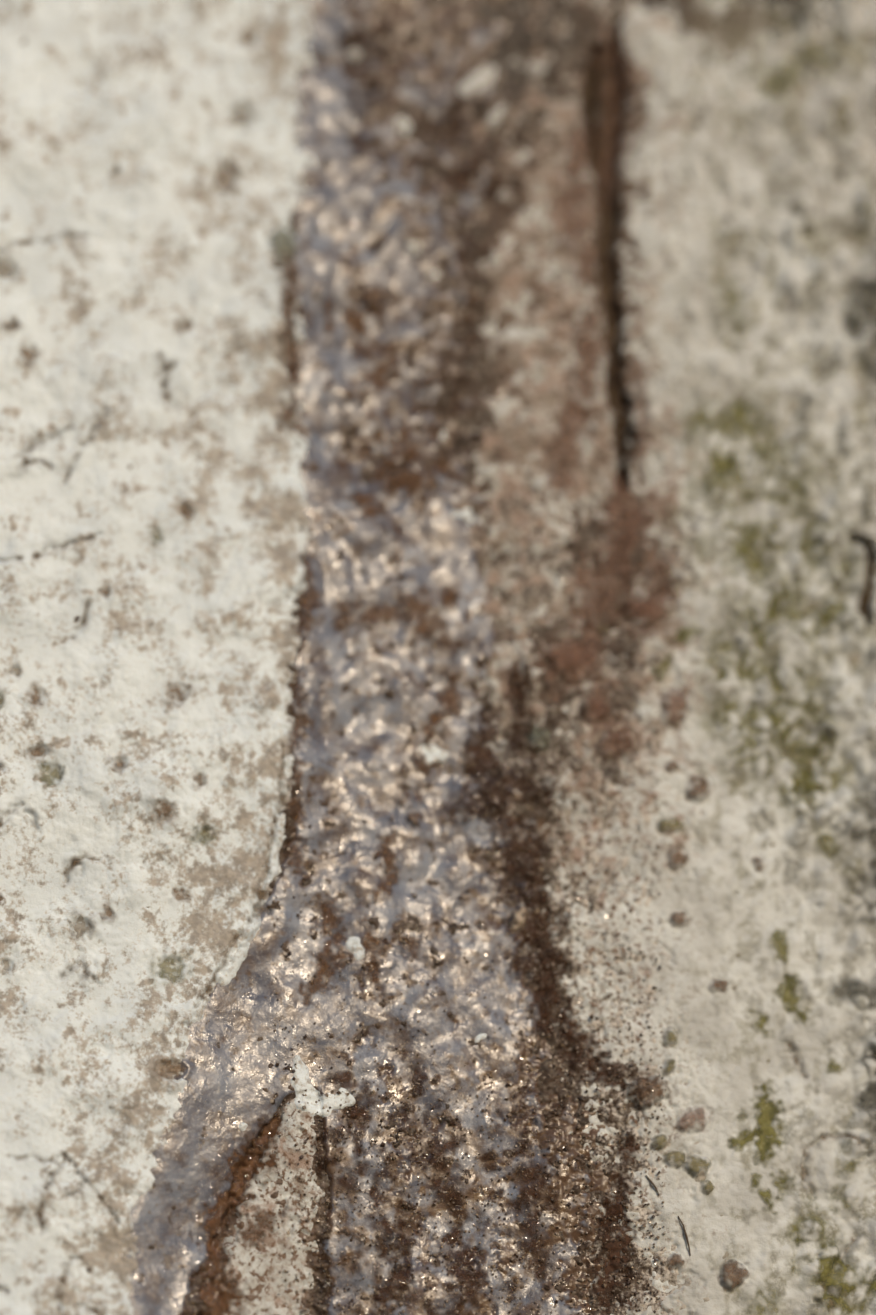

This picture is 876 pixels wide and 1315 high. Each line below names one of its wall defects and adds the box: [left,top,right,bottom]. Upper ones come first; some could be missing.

rust [409,78,518,199]
water stain [654,628,702,682]
crack [202,797,284,997]
rust [450,662,641,1094]
rust [392,1049,426,1123]
rust [315,1070,415,1315]
rust [416,1118,487,1315]
rust [494,1107,555,1291]
rust [585,1136,637,1315]